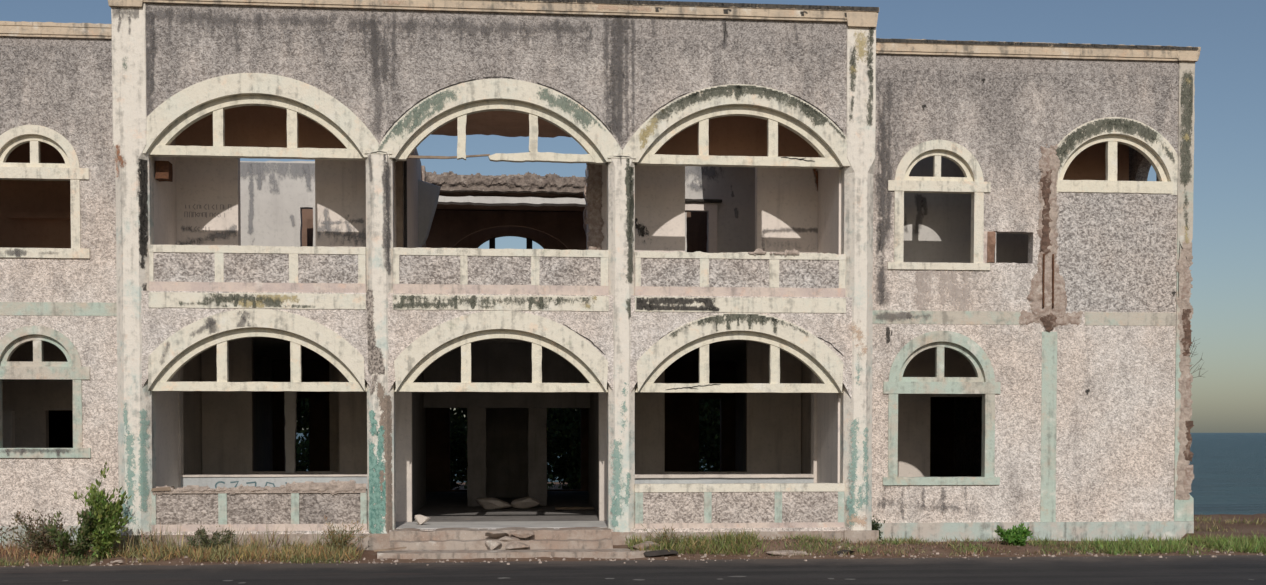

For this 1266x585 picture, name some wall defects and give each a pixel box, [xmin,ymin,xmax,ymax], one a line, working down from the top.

water stain [0,0,879,246]
water stain [399,295,475,309]
water stain [636,297,808,337]
flaking render [1019,144,1083,332]
spalling [1172,241,1194,500]